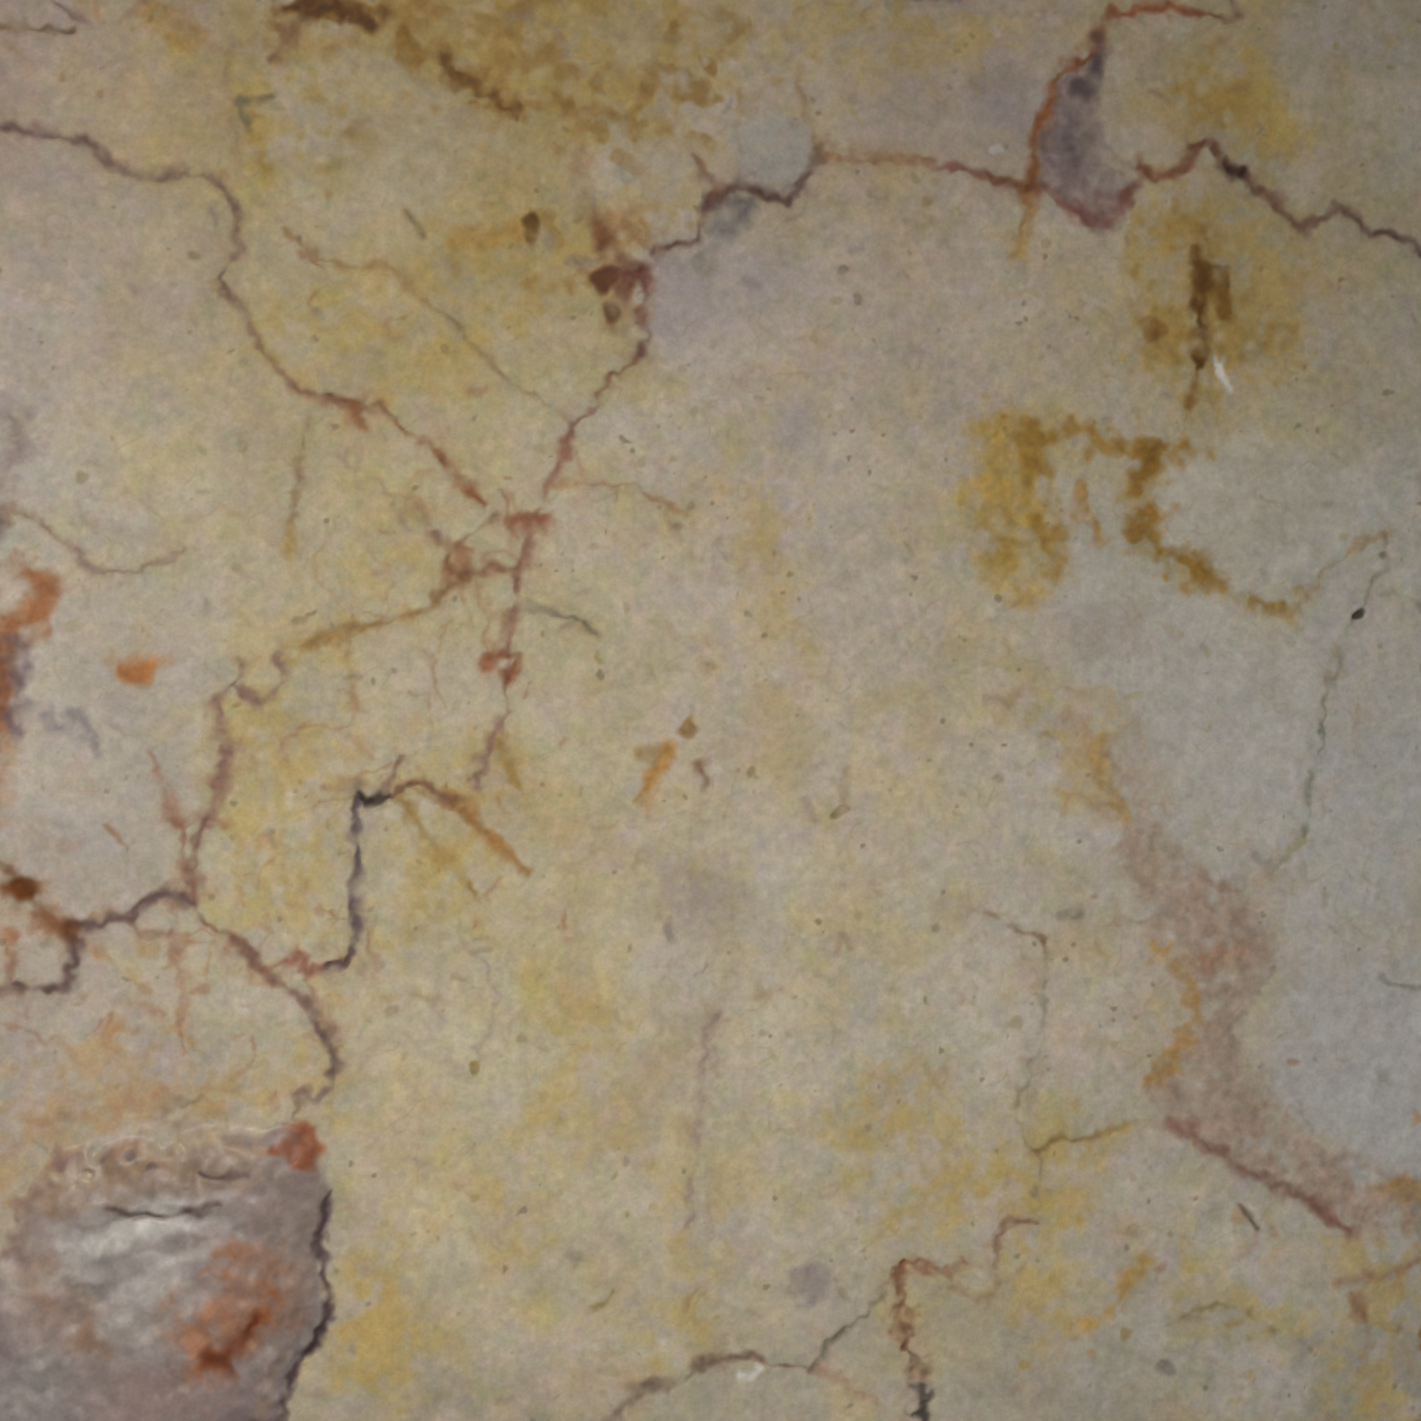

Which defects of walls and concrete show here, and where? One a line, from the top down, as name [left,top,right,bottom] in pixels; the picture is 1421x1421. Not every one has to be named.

crack [0,0,110,40]
damp [1013,0,1248,241]
crack [1132,132,1421,262]
rust [0,387,89,840]
rust [96,615,178,693]
crack [0,76,1047,1116]
damp [937,386,1316,638]
crack [1246,527,1394,883]
crack [598,902,1150,1421]
crack [1160,1299,1317,1356]